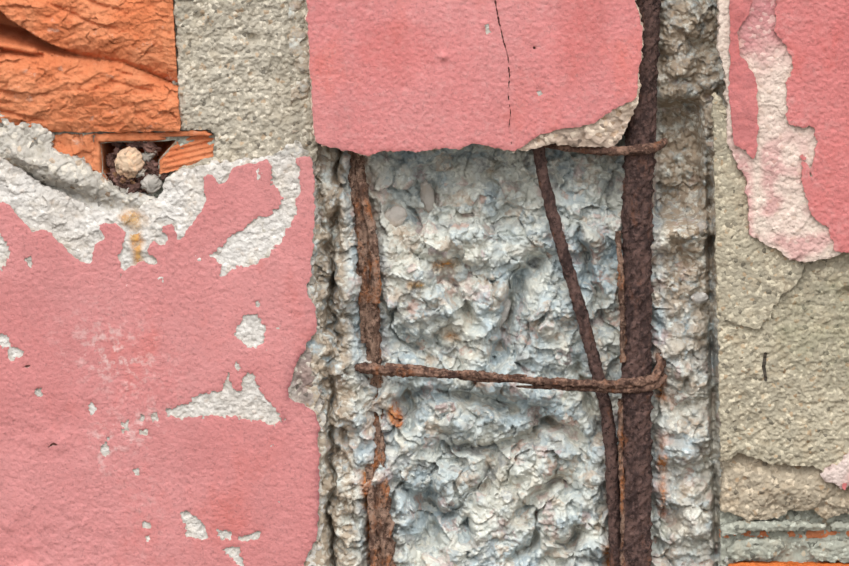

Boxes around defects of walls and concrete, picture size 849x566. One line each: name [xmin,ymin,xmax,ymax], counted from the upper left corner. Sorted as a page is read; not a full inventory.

crack [494,0,512,144]
peeling [0,111,301,276]
peeling [139,361,286,435]
rust [354,152,382,343]
rust [363,467,378,566]
rust [388,403,403,427]
spalling [366,81,642,566]
rust [605,398,625,566]
rust [615,231,627,363]
spalling [650,395,658,566]
peeling [710,0,841,329]
peeling [820,452,849,490]